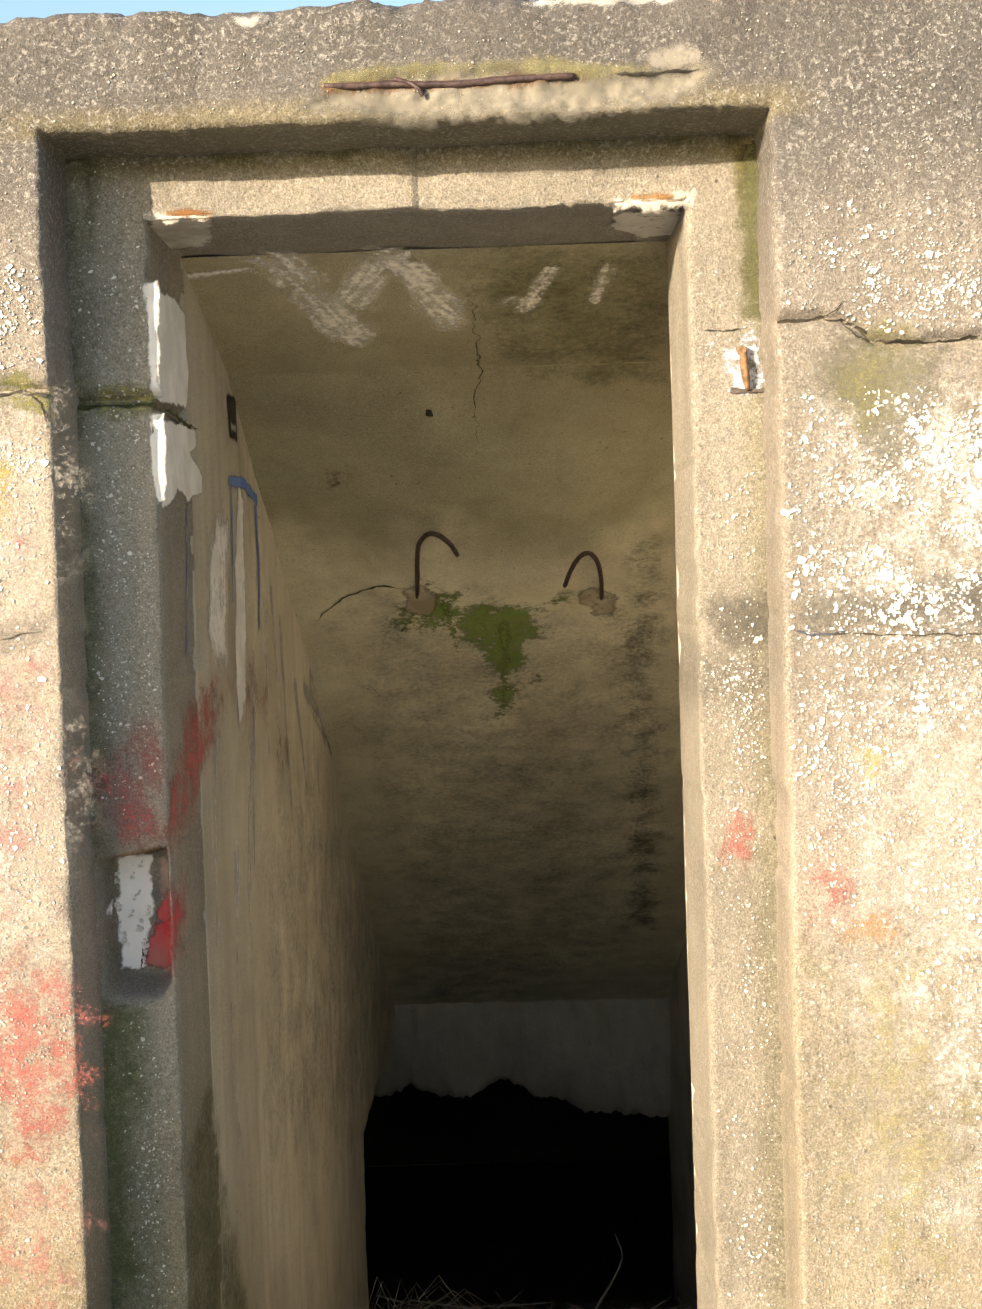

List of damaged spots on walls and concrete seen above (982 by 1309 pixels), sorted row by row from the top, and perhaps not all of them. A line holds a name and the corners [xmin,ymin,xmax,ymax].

crack [777,301,982,345]
crack [468,280,483,447]
crack [0,389,47,422]
crack [77,403,198,429]
spalling [578,588,618,616]